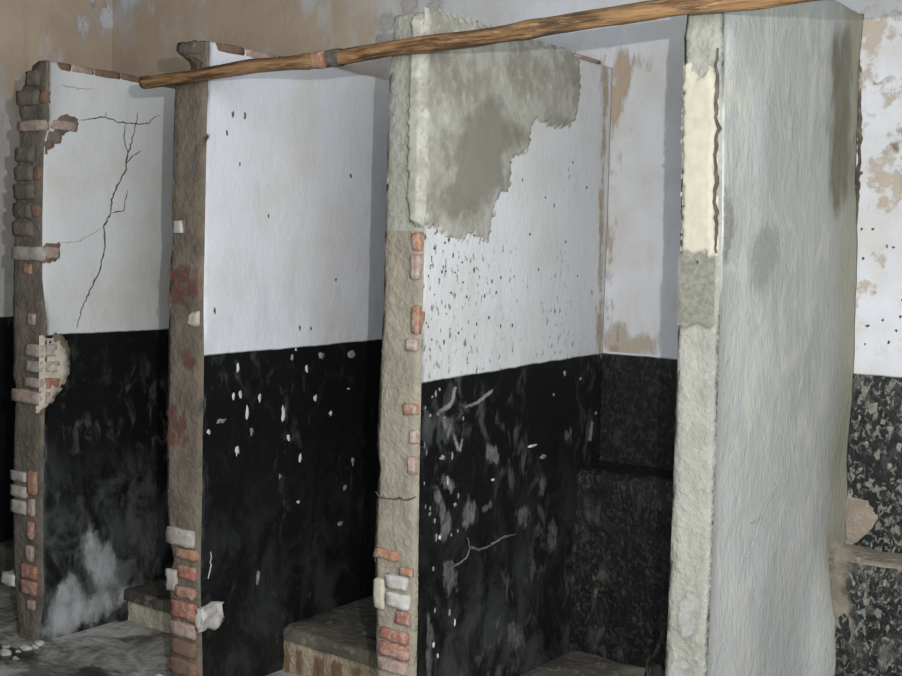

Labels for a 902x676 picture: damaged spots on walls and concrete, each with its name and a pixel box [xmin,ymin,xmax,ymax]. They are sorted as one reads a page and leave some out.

peeling [77,0,139,43]
peeling [862,16,896,53]
spalling [16,69,51,106]
spalling [11,114,79,274]
crack [62,113,160,327]
peeling [860,128,902,211]
spalling [27,313,36,325]
damp [44,532,152,645]